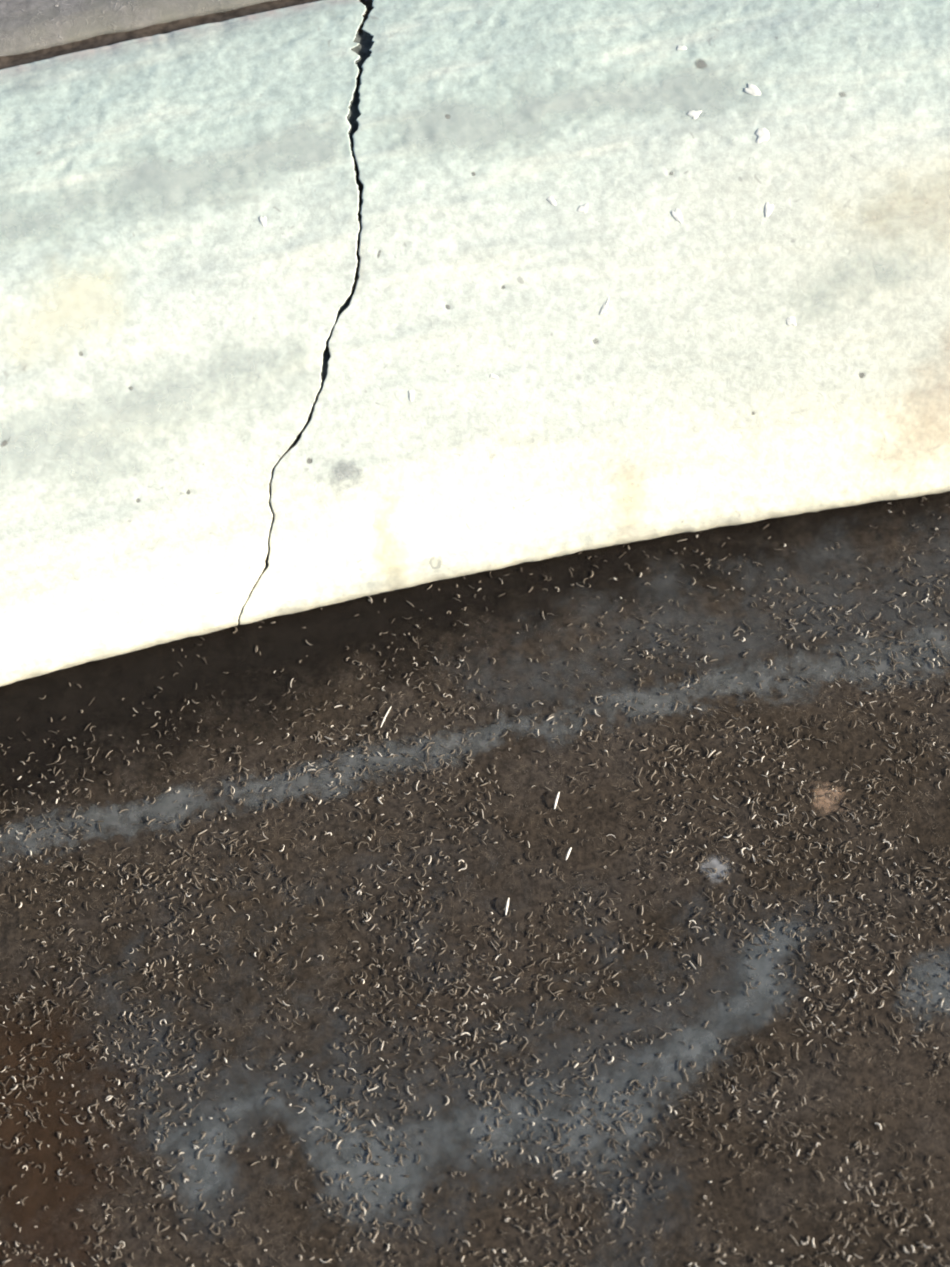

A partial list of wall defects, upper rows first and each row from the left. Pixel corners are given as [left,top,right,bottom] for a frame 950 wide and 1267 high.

crack [238,0,374,622]
water stain [0,491,950,796]
water stain [0,627,950,856]